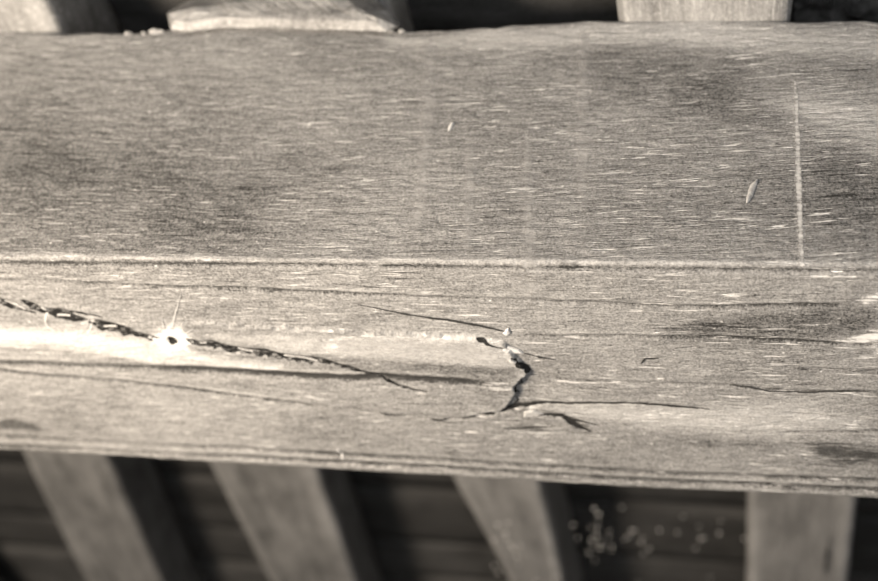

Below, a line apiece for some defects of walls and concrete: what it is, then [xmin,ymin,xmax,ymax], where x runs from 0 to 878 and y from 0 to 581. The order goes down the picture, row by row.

crack [0,298,158,341]
crack [358,304,505,332]
crack [186,338,426,392]
crack [339,401,710,432]